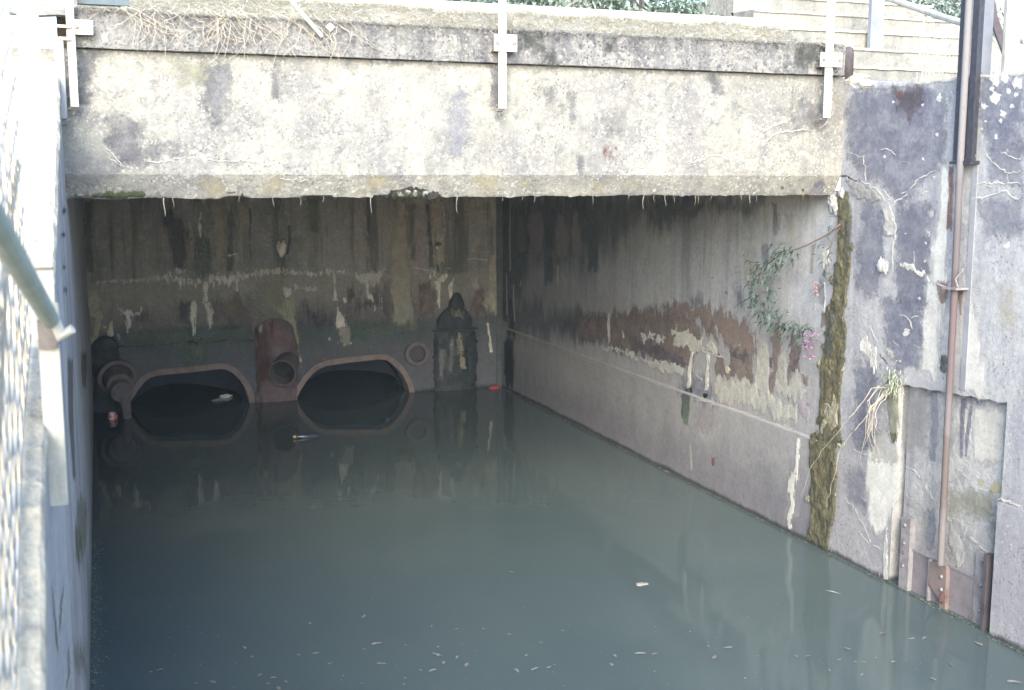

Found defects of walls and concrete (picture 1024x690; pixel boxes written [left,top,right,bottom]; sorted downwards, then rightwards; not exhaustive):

damp [84,182,284,345]
damp [272,175,600,388]
damp [656,195,699,227]
damp [714,195,796,263]
damp [815,246,835,360]
crack [851,148,936,207]
crack [970,149,1023,214]
peeling [577,299,811,425]
damp [787,438,801,529]